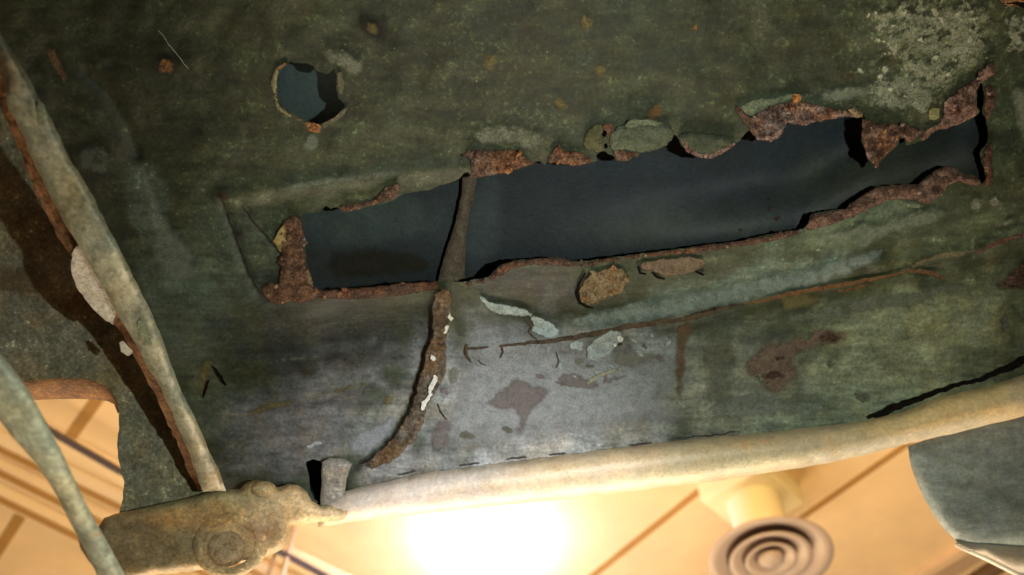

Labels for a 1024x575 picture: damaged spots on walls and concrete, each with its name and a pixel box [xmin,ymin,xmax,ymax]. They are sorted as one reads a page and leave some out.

peeling [867,0,991,113]
peeling [1005,5,1024,54]
corrosion [463,143,994,286]
corrosion [262,215,439,305]
peeling [421,210,942,449]
corrosion [747,330,844,393]
crack [867,356,1024,419]